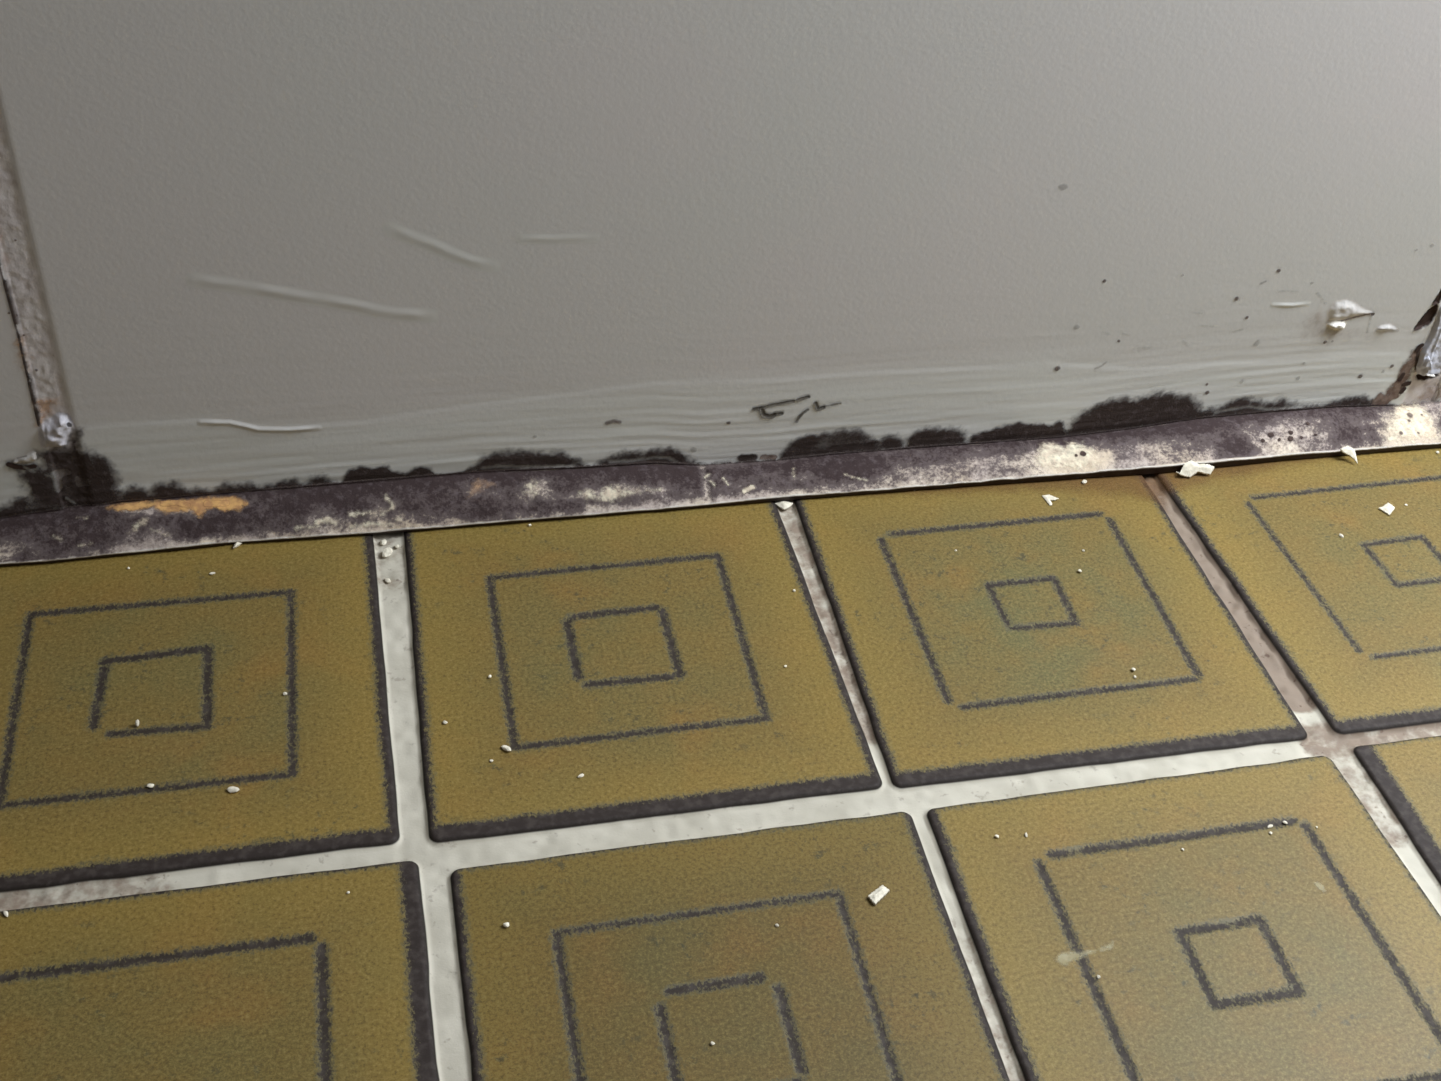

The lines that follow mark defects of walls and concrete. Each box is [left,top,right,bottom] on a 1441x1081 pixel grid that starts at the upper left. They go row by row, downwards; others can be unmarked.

damp [0,343,1441,562]